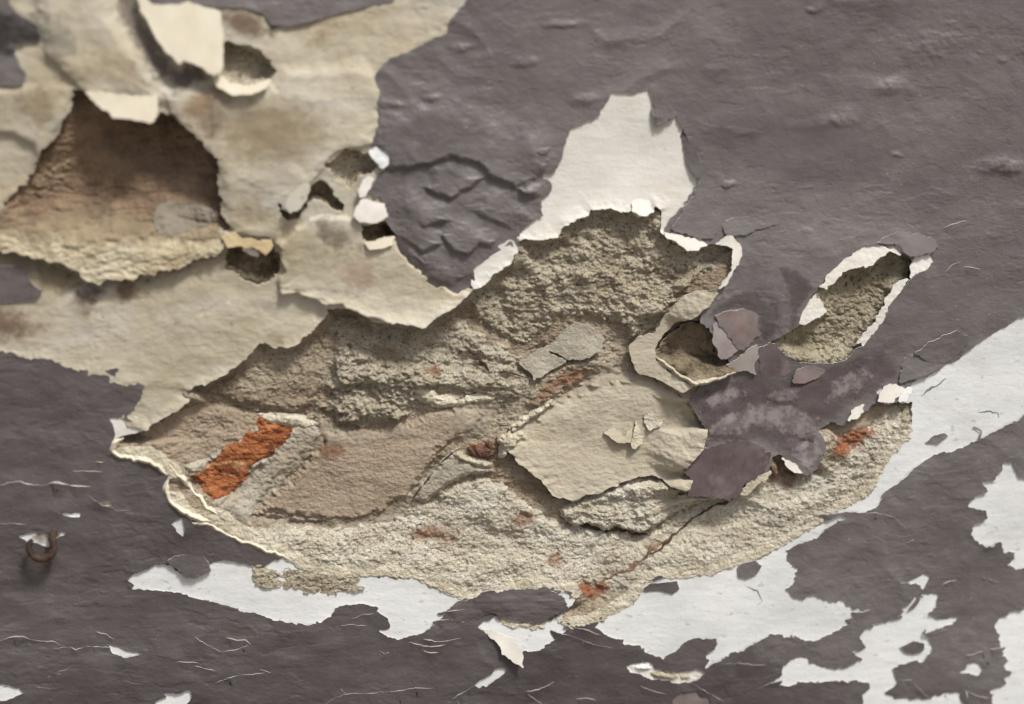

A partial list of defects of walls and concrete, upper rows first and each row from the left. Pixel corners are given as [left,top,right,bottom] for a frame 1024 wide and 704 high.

peeling [0,0,518,440]
flaking render [109,85,1024,668]
crack [566,484,746,582]